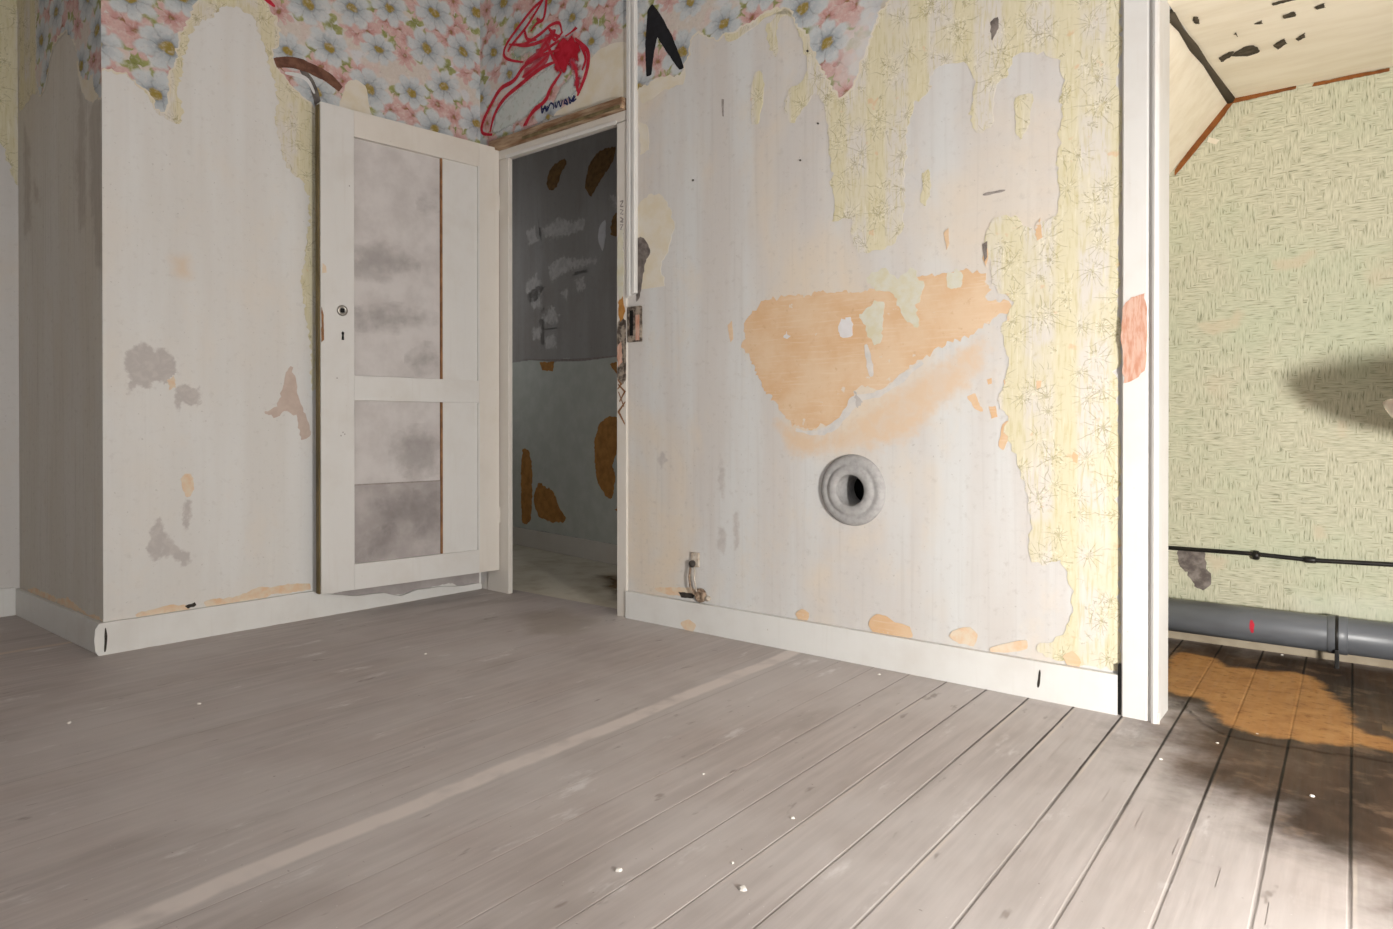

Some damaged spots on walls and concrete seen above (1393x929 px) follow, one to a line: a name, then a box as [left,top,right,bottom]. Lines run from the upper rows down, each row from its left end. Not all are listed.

flaking render [990,17,999,40]
flaking render [727,241,1012,471]
peeling [1121,294,1147,383]
peeling [165,373,210,418]
flaking render [655,587,695,598]
flaking render [869,614,913,638]
flaking render [949,627,1028,653]
flaking render [1063,651,1081,667]
water stain [1168,638,1393,720]
water stain [1008,695,1393,929]